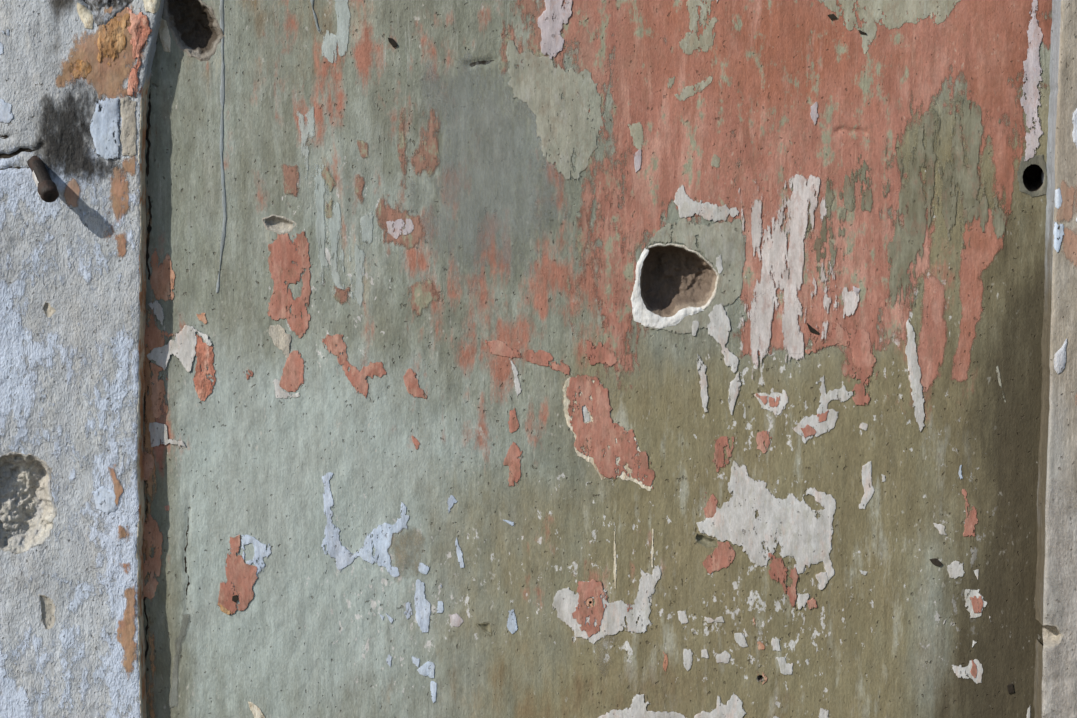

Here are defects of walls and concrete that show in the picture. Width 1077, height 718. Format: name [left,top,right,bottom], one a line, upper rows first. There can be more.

crack [0,135,35,170]
rust [108,156,136,257]
peeling [137,185,216,447]
peeling [262,107,427,399]
peeling [485,0,1052,491]
spalling [0,452,57,554]
rust [108,465,123,506]
rust [144,343,156,526]
peeling [552,529,661,644]
peeling [694,436,836,610]
rust [117,587,156,718]
peeling [598,693,746,718]